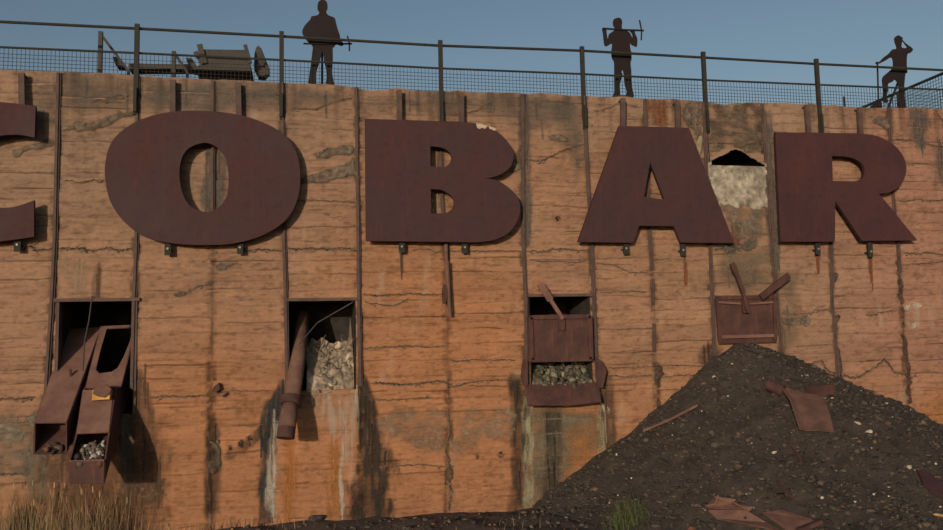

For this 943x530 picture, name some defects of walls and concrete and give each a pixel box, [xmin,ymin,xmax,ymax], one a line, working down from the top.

peeling [708,103,768,210]
crack [893,138,943,166]
crack [899,196,943,204]
crack [903,251,943,266]
crack [363,292,442,307]
crack [812,357,919,379]
crack [0,395,36,403]
leakage [207,423,218,458]
leakage [244,380,285,523]
leakage [338,379,393,520]
leakage [205,468,219,515]